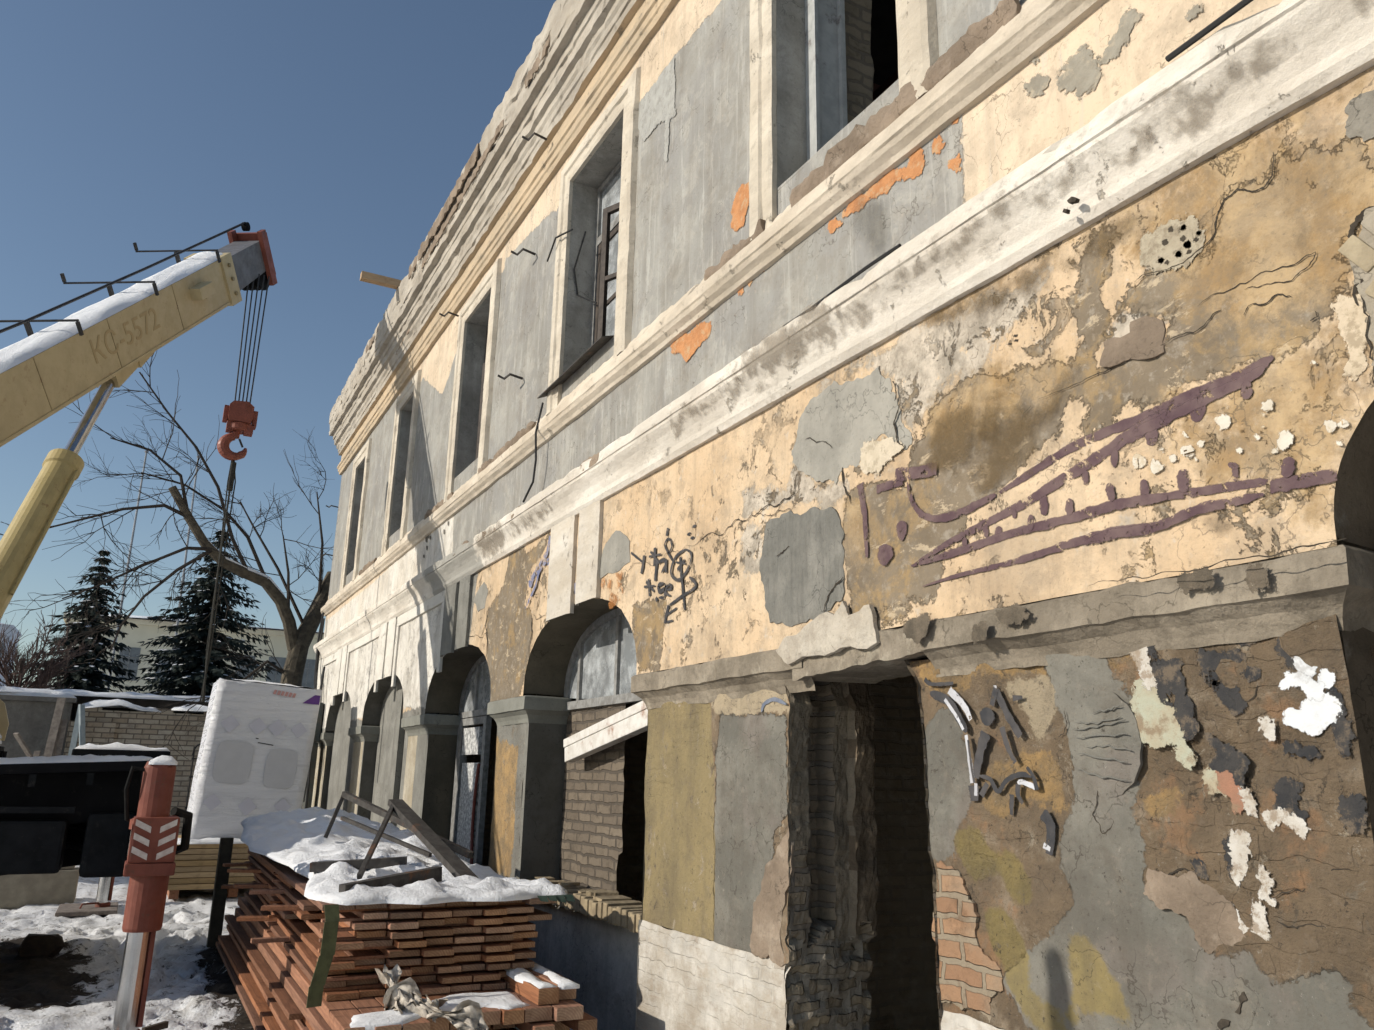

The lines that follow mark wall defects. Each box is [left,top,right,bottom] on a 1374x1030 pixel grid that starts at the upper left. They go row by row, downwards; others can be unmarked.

flaking render [789,0,1021,208]
flaking render [1024,7,1145,103]
flaking render [704,182,766,281]
flaking render [1139,213,1208,275]
crack [1162,252,1318,345]
flaking render [1330,207,1374,381]
crack [1347,206,1374,238]
crack [1352,278,1374,383]
crack [1022,360,1128,418]
peeling [1129,642,1356,954]
flaking render [750,827,795,967]
flaking render [932,861,1004,1023]